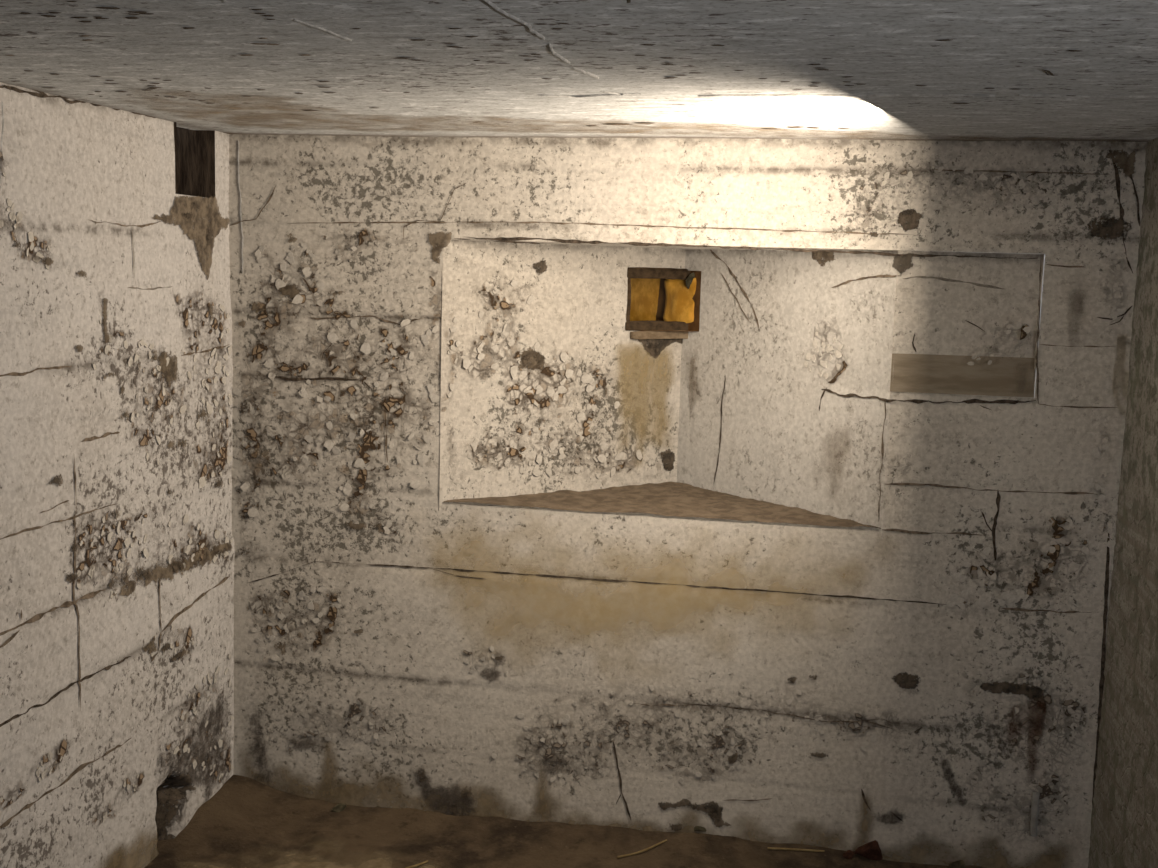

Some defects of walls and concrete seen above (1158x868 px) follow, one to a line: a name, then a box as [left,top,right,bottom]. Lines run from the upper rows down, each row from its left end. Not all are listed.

peeling [92,196,676,535]
crack [230,183,1132,561]
spalling [66,508,251,599]
crack [0,431,966,729]
leakage [474,564,754,631]
leakage [105,697,228,868]
spalling [155,654,234,852]
leakage [249,715,701,834]
leakage [881,841,1065,868]